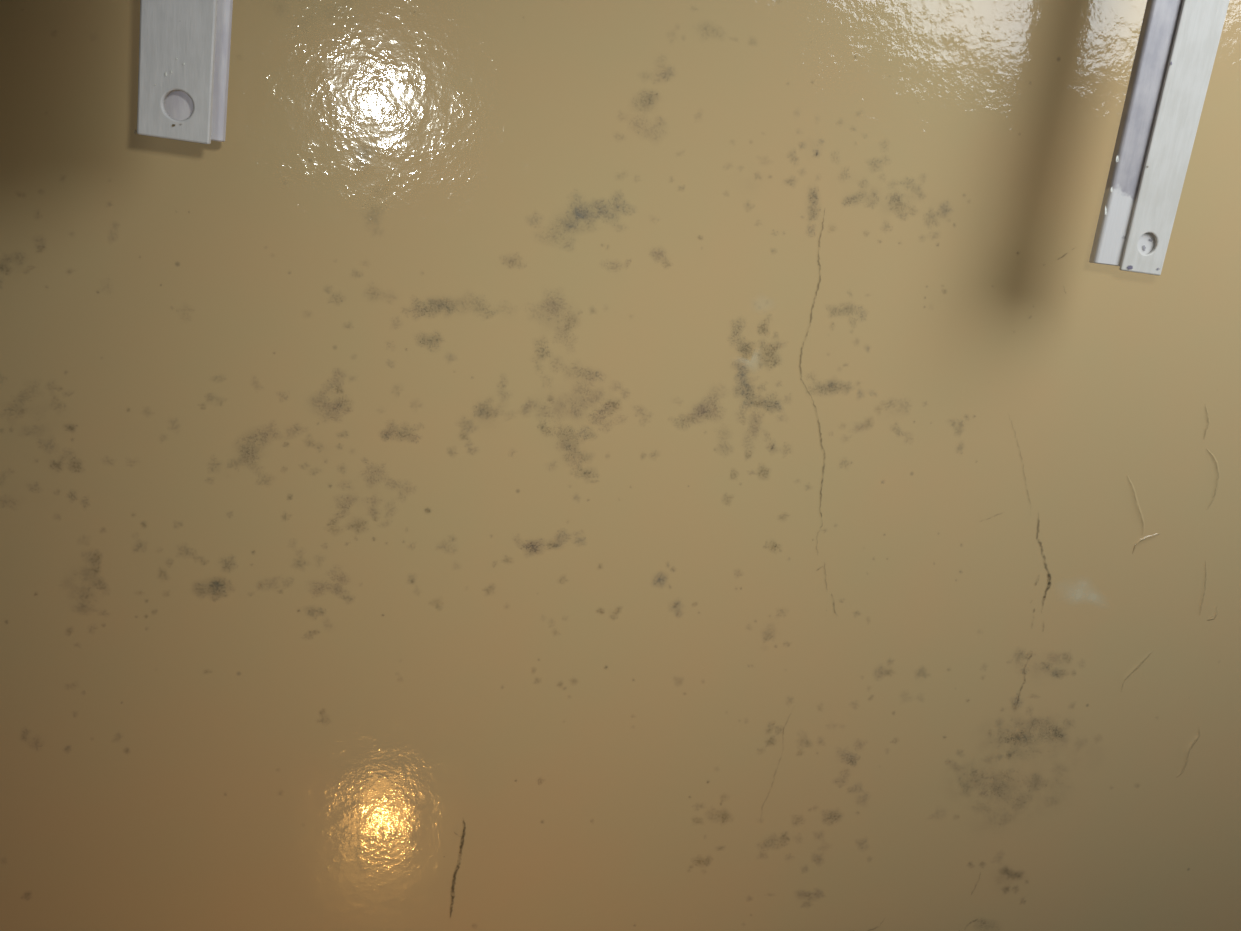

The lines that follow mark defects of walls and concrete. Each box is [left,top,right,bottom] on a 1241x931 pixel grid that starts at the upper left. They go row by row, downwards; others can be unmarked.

crack [451,827,465,912]